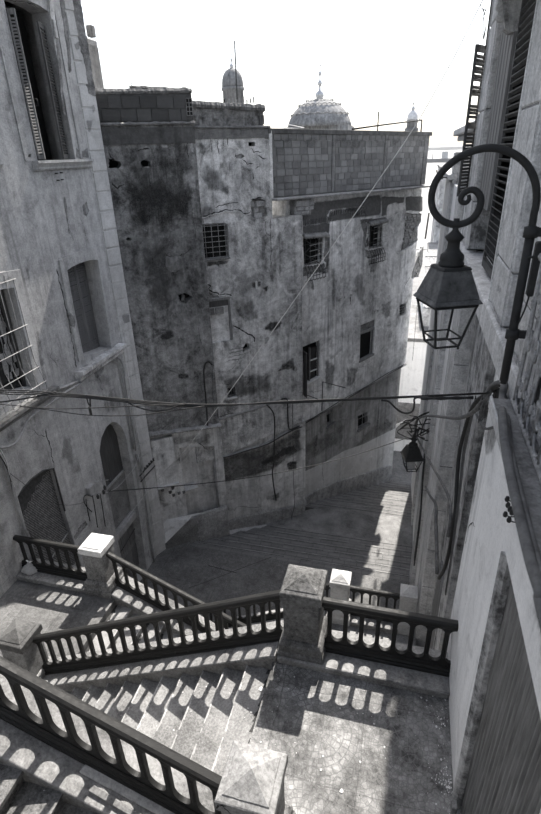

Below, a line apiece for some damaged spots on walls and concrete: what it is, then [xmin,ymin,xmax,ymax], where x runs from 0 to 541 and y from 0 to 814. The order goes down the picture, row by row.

spalling [250,198,267,219]